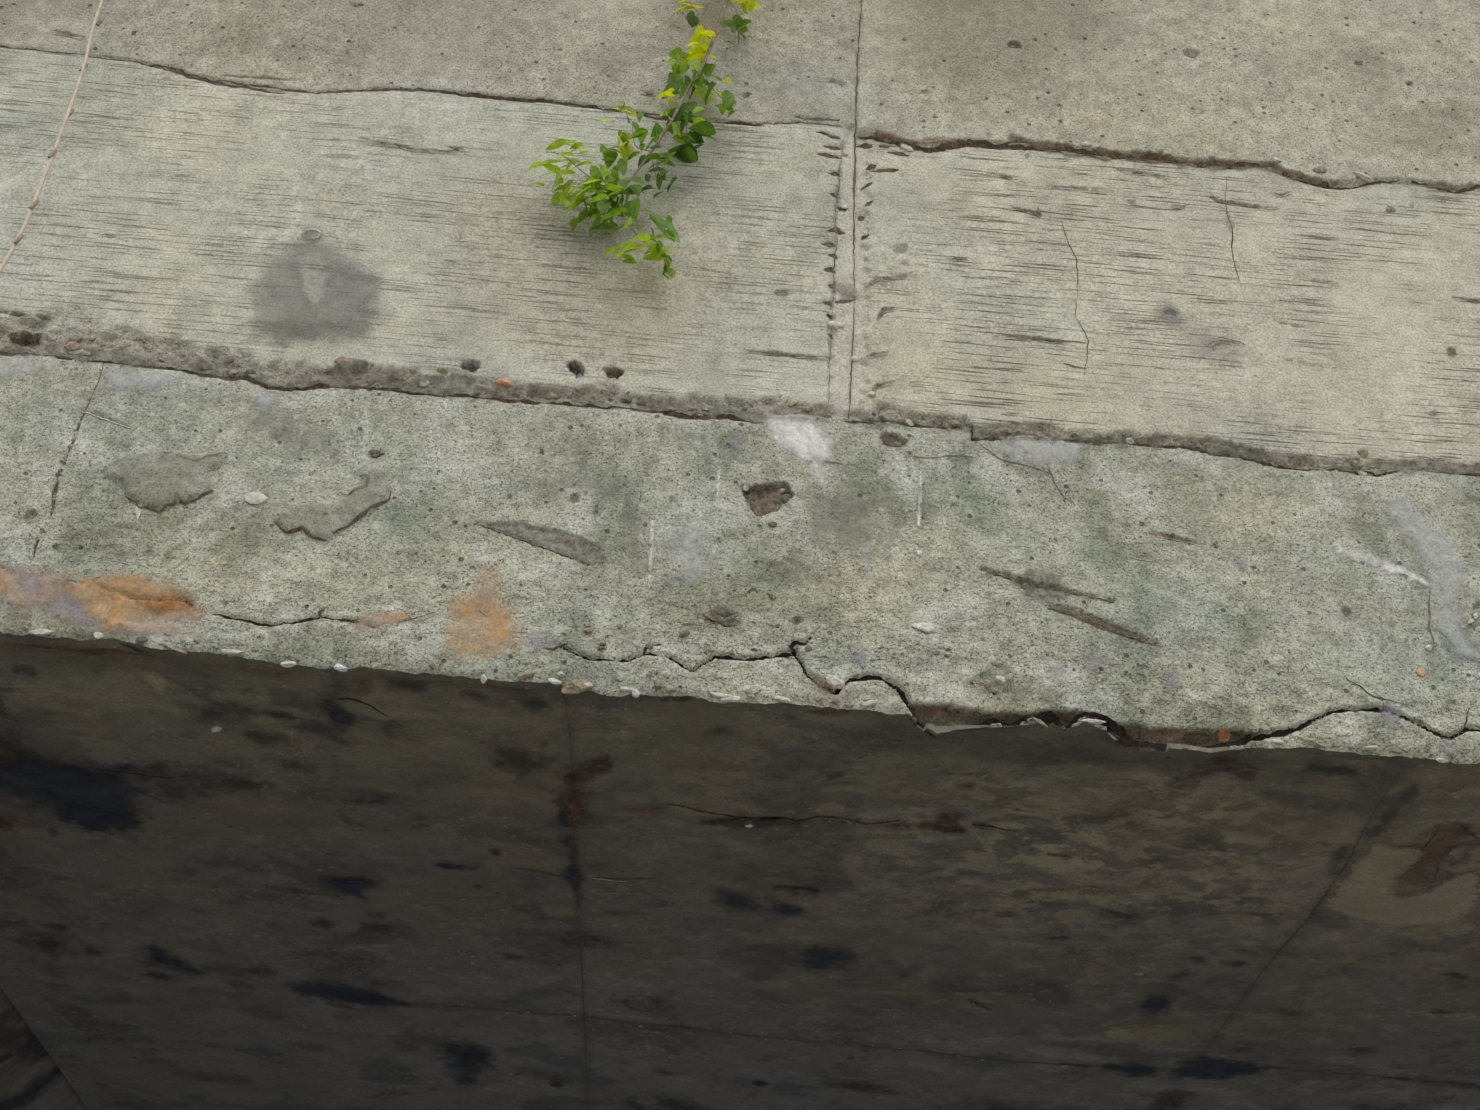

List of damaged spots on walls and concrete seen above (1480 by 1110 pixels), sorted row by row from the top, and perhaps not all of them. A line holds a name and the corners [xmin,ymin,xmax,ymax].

damp [260,235,374,335]
spalling [740,483,792,527]
rust [69,576,197,633]
crack [1428,585,1480,663]
crack [543,637,926,732]
crack [971,678,1480,751]
damp [0,750,190,831]
crack [675,805,900,828]
damp [295,982,410,1007]